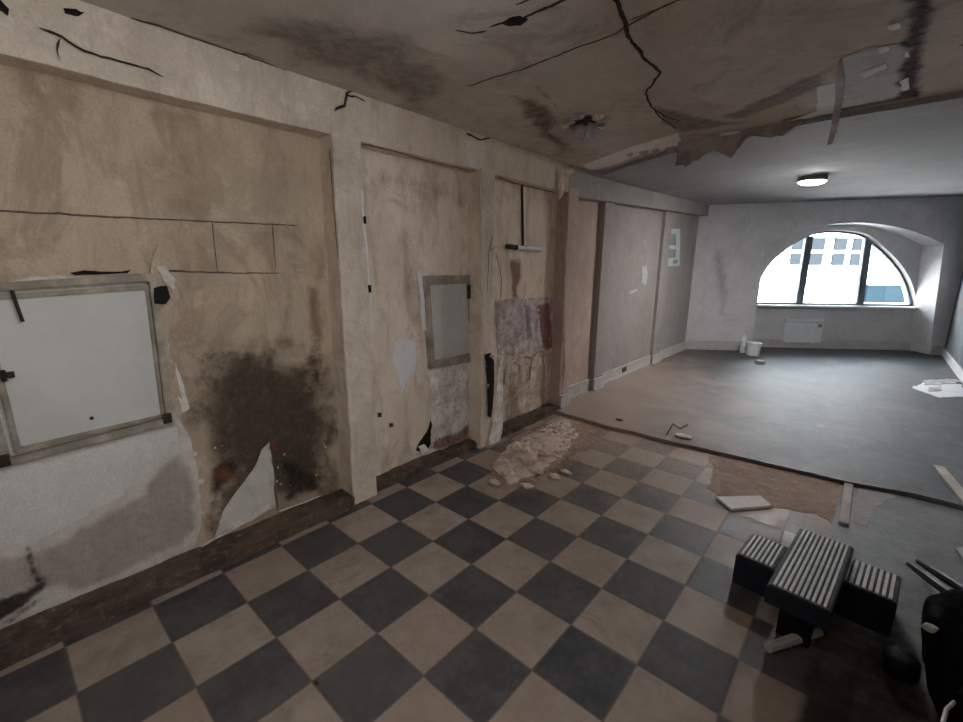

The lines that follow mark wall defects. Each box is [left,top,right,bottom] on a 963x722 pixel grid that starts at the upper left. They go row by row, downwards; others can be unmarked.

spalling [64,8,84,16]
crack [39,27,163,77]
crack [456,0,681,129]
crack [334,91,366,111]
leakage [206,353,335,509]